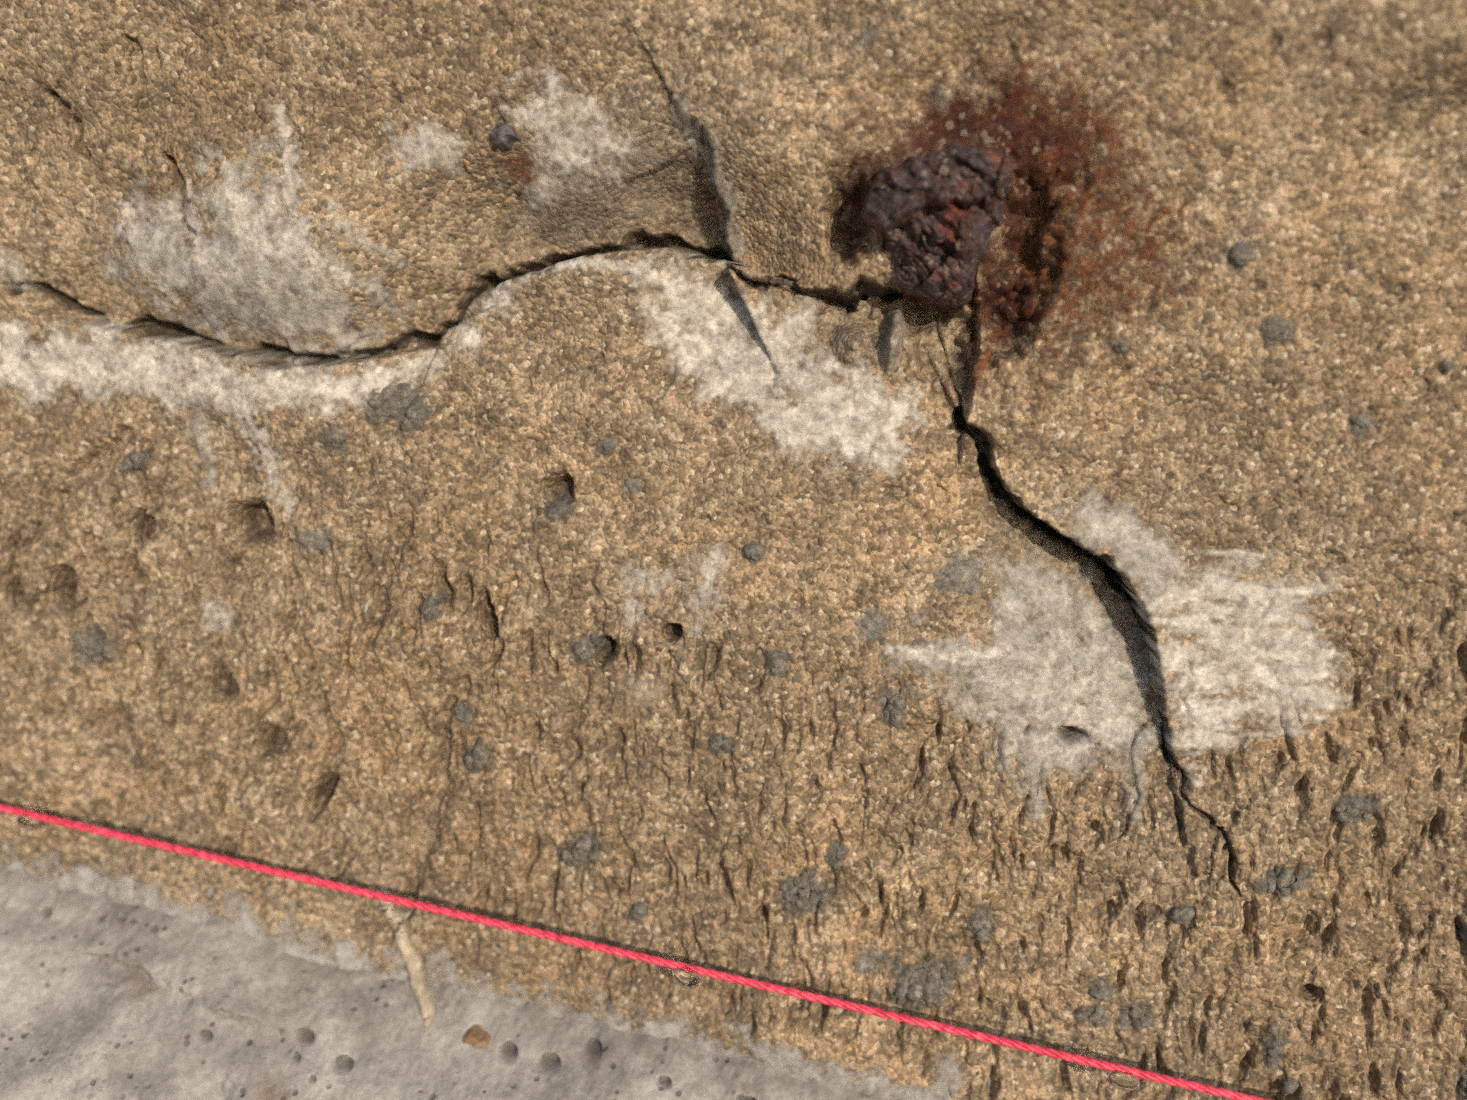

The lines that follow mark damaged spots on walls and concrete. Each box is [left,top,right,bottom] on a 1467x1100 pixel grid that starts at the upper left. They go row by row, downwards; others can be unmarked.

crack [6,235,900,368]
leakage [0,104,927,518]
efflorescence [499,67,638,209]
corrosion [842,62,1187,385]
crack [955,394,1241,896]
efflorescence [884,493,1350,817]